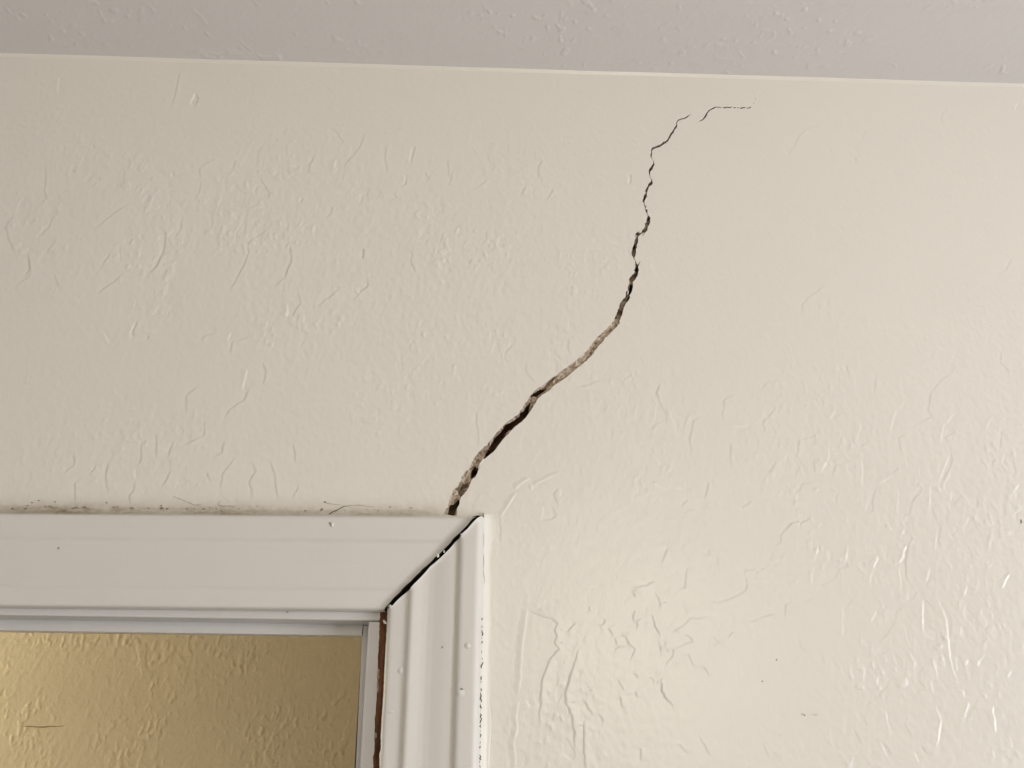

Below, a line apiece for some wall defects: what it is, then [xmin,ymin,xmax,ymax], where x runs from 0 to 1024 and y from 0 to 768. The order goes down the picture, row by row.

crack [436,107,751,583]